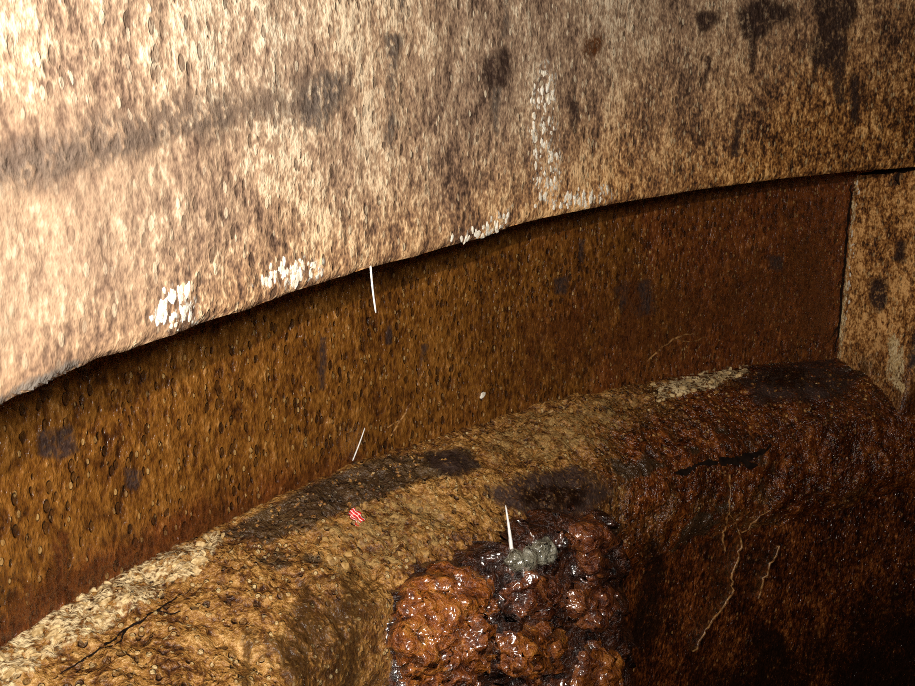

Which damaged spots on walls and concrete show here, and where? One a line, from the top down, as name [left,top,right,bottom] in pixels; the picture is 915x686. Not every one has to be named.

water stain [483,47,510,128]
water stain [697,11,718,31]
water stain [736,0,794,73]
water stain [809,0,859,122]
water stain [529,66,612,210]
water stain [731,105,742,157]
efflorescence [261,256,323,289]
efflorescence [149,281,194,331]
water stain [428,450,479,477]
water stain [486,466,609,516]
crack [675,444,775,652]
crack [757,546,780,599]